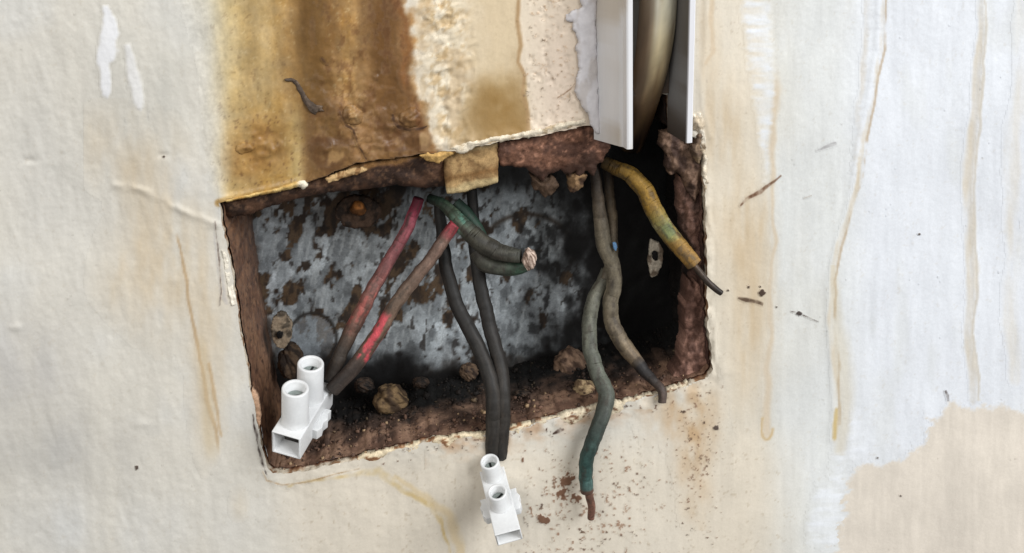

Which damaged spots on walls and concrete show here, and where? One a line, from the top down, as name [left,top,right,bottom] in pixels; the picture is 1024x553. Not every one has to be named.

corrosion [179,0,444,201]
water stain [825,0,889,450]
water stain [960,0,989,405]
corrosion [425,437,486,470]
corrosion [507,411,595,458]
corrosion [607,371,728,531]